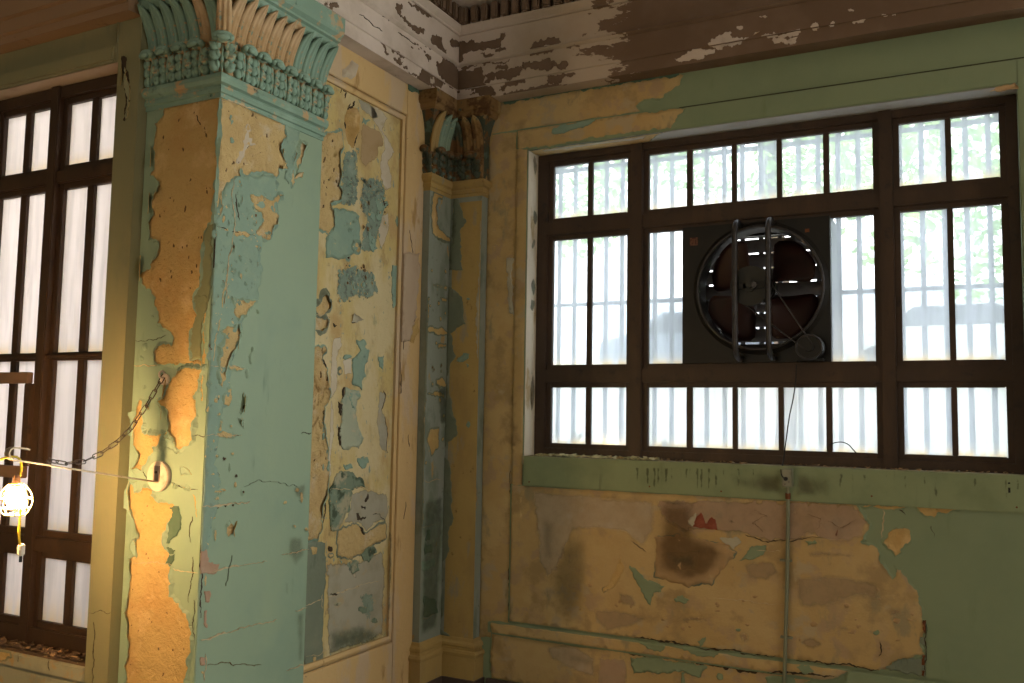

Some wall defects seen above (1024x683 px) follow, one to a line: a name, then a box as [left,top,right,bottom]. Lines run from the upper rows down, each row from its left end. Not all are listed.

flaking render [123,97,308,683]
crack [170,480,309,666]
flaking render [283,100,400,652]
flaking render [380,2,961,683]
water stain [663,510,715,575]